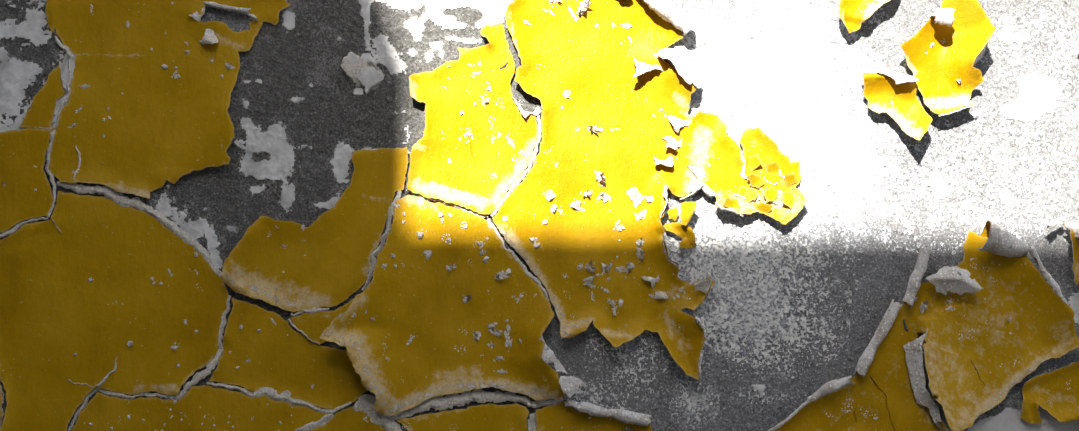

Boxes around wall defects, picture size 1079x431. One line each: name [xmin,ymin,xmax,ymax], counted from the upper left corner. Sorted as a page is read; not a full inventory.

flaking render [0,0,76,138]
crack [0,36,563,431]
flaking render [146,0,514,279]
flaking render [542,0,1079,431]
peeling [528,412,537,431]